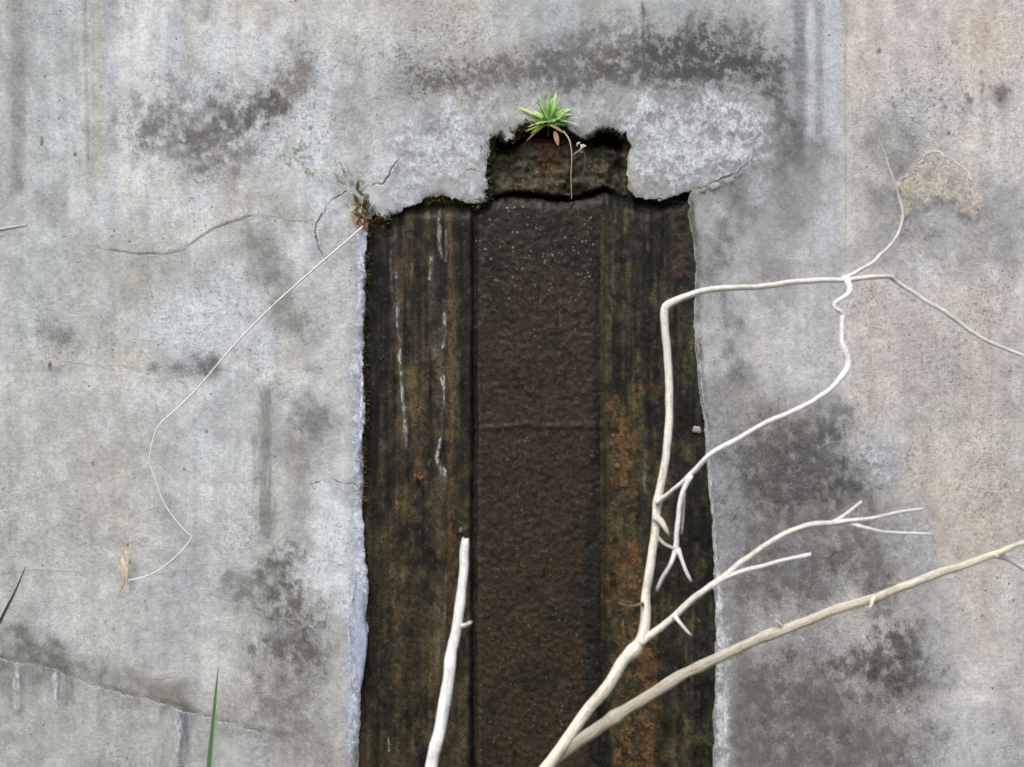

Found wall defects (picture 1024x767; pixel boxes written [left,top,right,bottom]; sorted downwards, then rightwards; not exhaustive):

water stain [186,40,314,172]
crack [267,159,399,252]
spalling [347,127,741,767]
rust [601,393,661,767]
water stain [386,0,951,767]